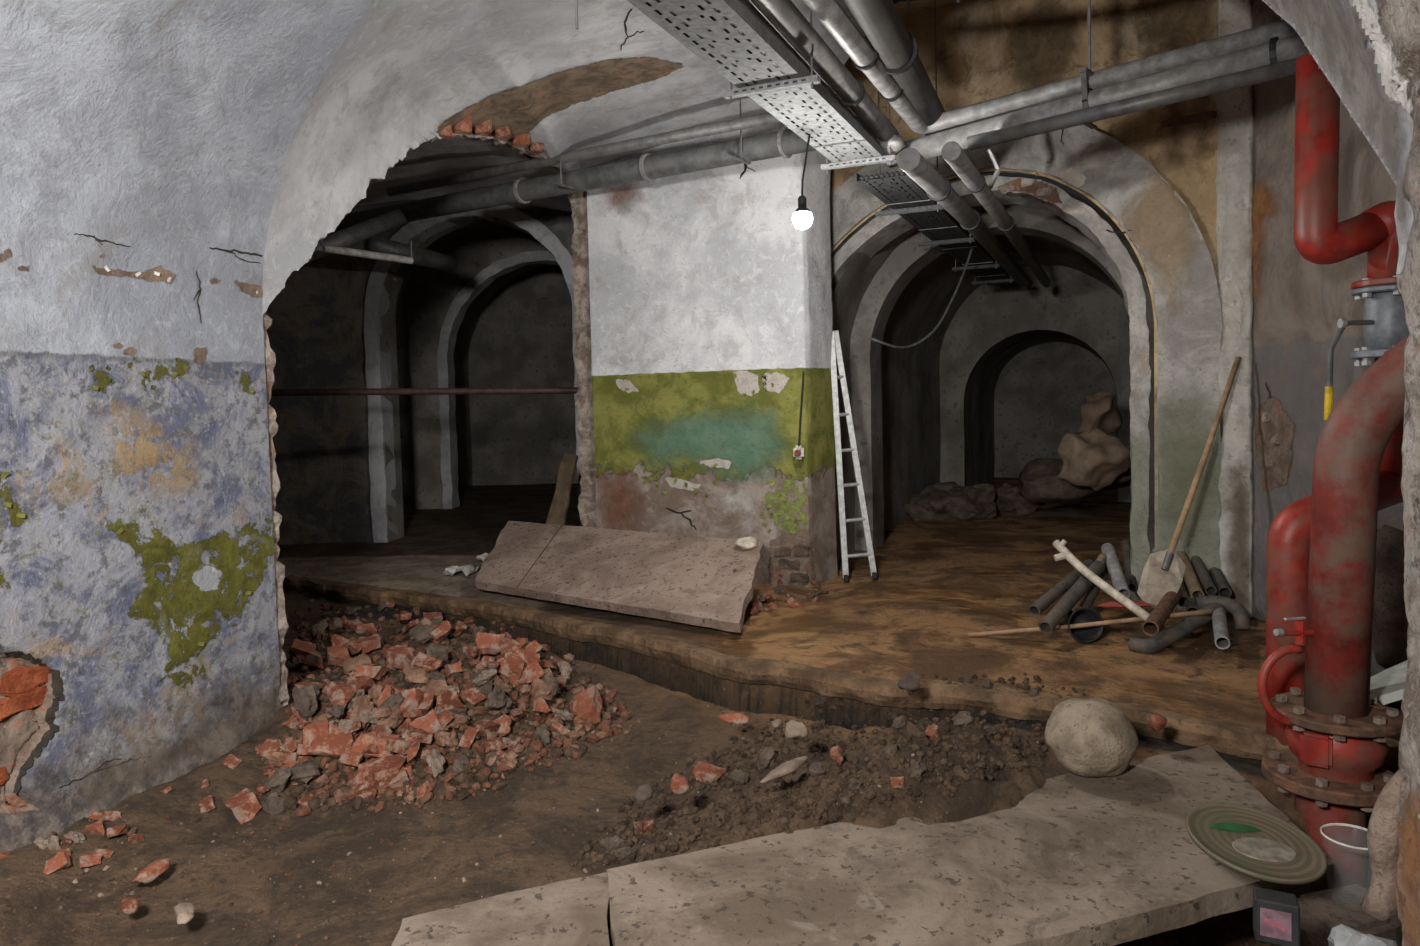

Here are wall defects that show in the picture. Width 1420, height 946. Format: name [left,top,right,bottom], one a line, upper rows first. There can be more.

flaking render [439,116,545,154]
crack [73,233,131,247]
corrosion [1252,185,1275,294]
spalling [0,249,30,271]
spalling [93,254,176,284]
crack [194,247,263,323]
spalling [210,278,263,298]
peeling [615,379,638,393]
peeling [731,370,790,397]
spalling [0,651,64,814]